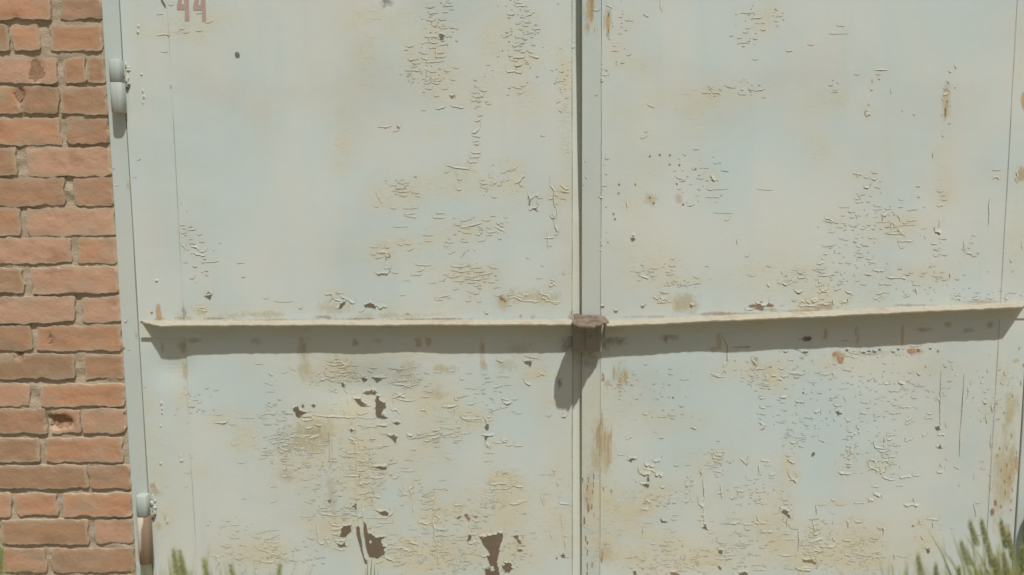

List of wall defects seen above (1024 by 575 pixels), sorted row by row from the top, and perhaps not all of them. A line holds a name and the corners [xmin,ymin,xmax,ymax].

peeling [400,0,569,190]
peeling [325,291,388,316]
peeling [766,172,1023,302]
peeling [174,355,536,575]
peeling [582,453,840,575]
peeling [733,334,957,483]